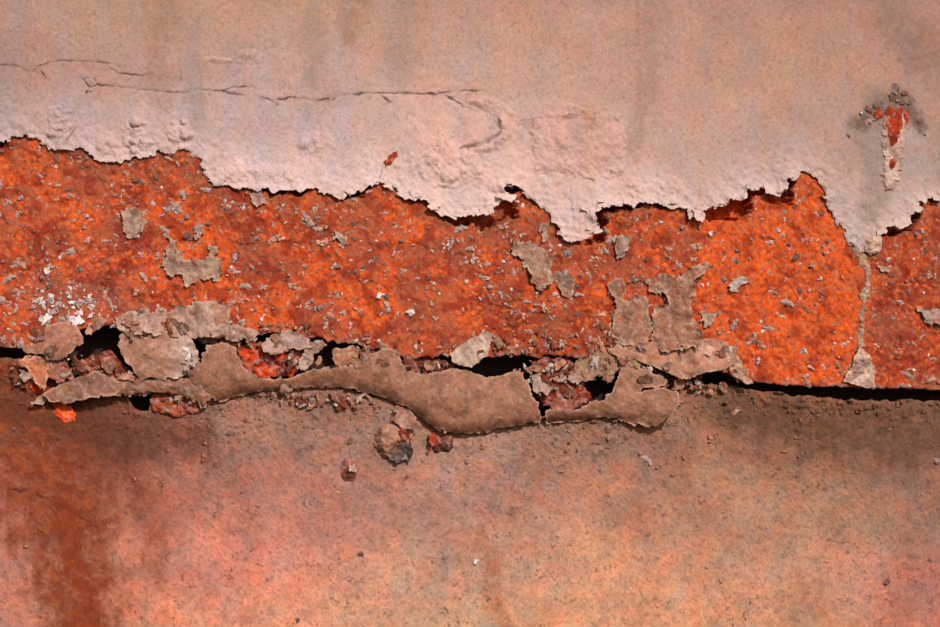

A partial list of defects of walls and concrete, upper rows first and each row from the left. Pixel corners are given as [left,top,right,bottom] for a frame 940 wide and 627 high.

spalling [384,151,398,167]
spalling [847,83,927,192]
peeling [409,189,458,220]
peeling [479,181,517,214]
peeling [581,198,611,234]
peeling [623,180,786,222]
peeling [862,194,928,256]
rust [0,134,940,391]
peeling [18,299,753,463]
rust [0,361,121,627]